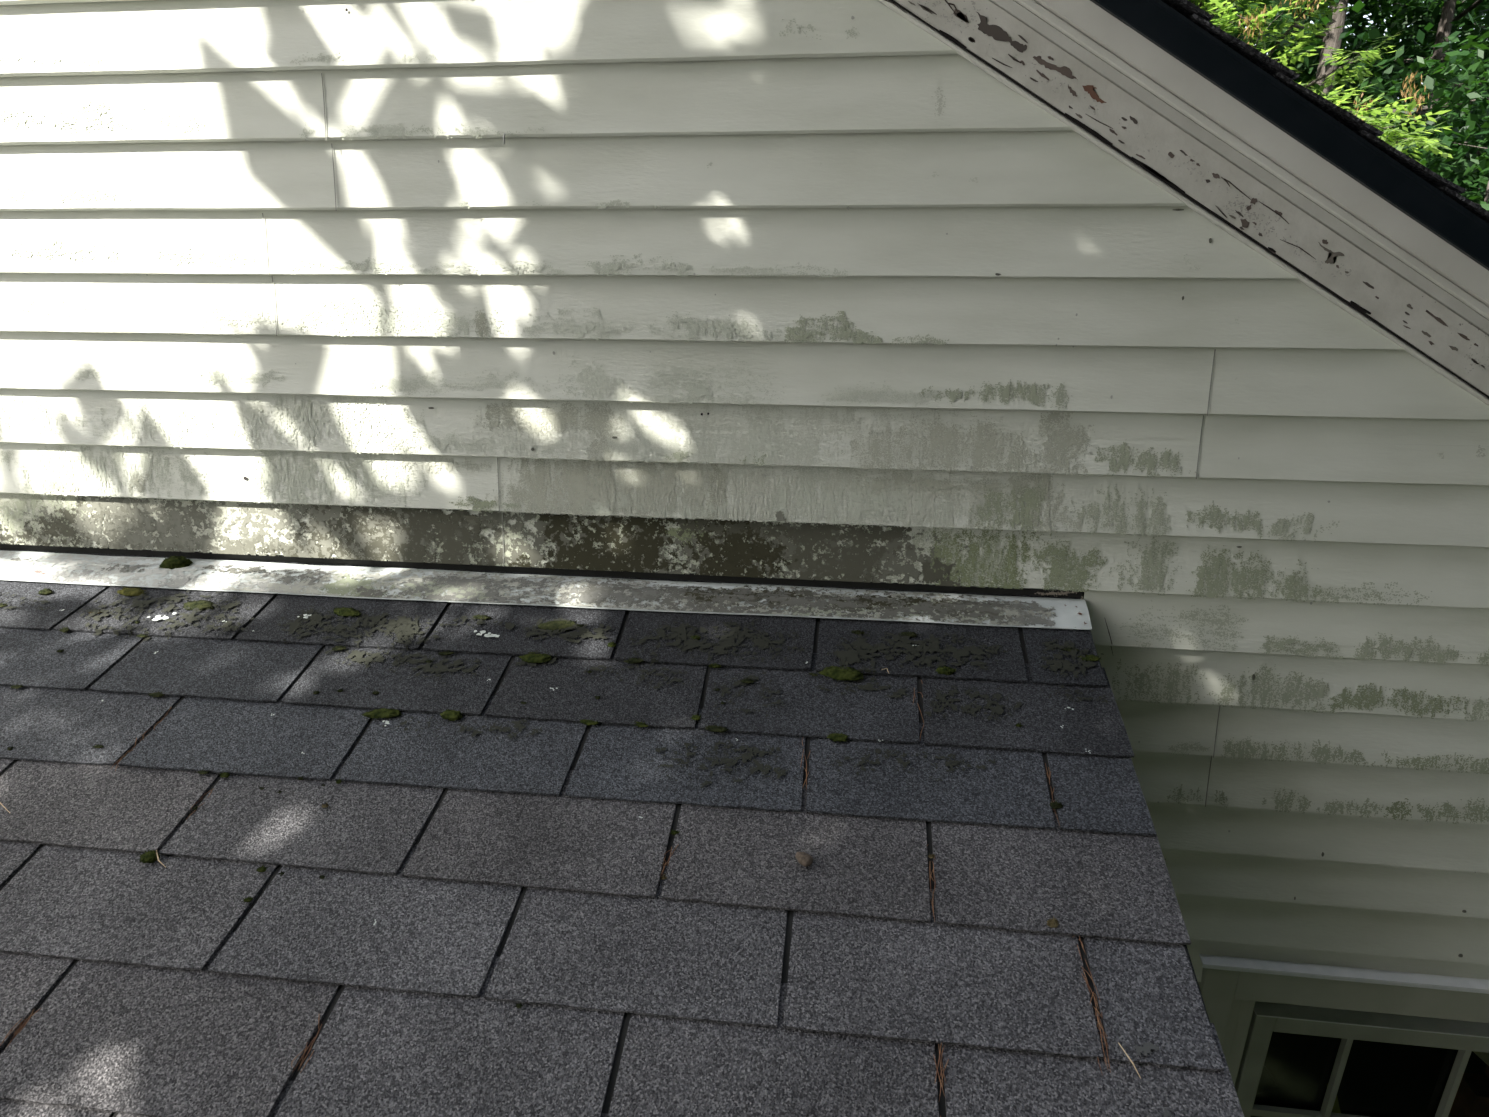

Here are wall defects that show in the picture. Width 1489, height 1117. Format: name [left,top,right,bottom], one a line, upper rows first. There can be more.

peeling [908,1,1106,118]
peeling [1109,116,1146,159]
peeling [1168,150,1220,183]
peeling [1229,198,1276,254]
peeling [1318,239,1379,299]
peeling [1403,304,1485,368]
water stain [0,291,1058,627]